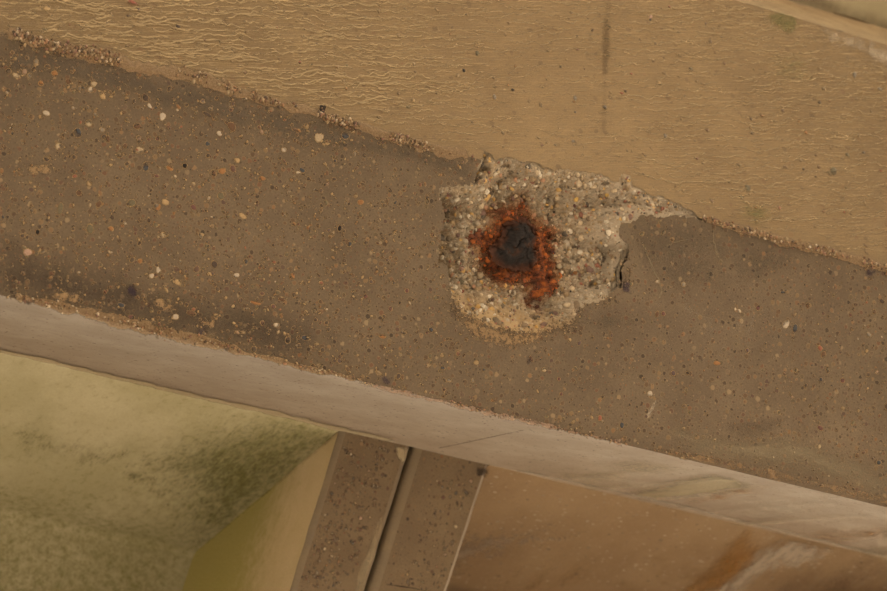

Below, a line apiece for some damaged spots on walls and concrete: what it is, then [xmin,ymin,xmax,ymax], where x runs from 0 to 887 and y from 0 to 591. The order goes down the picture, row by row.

spalling [0,27,887,446]
corrosion [468,199,559,314]
spalling [767,283,887,476]
spalling [653,439,887,505]
leakage [713,542,822,591]